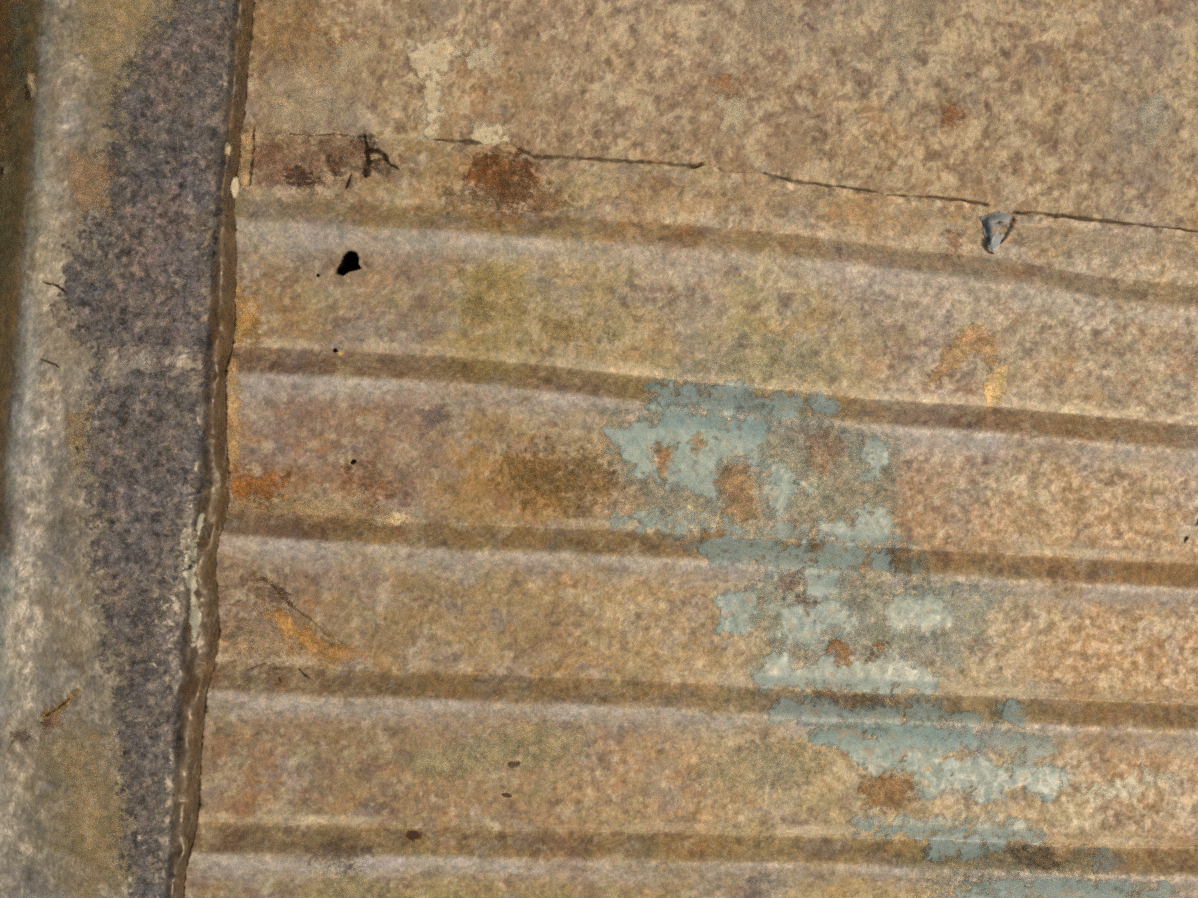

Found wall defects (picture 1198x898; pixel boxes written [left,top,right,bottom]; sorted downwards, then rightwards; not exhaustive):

crack [249,126,400,189]
crack [432,137,482,145]
corrosion [444,147,567,213]
crack [518,148,705,168]
crack [763,172,1198,232]
corrosion [500,443,617,518]
peeling [602,379,1181,898]